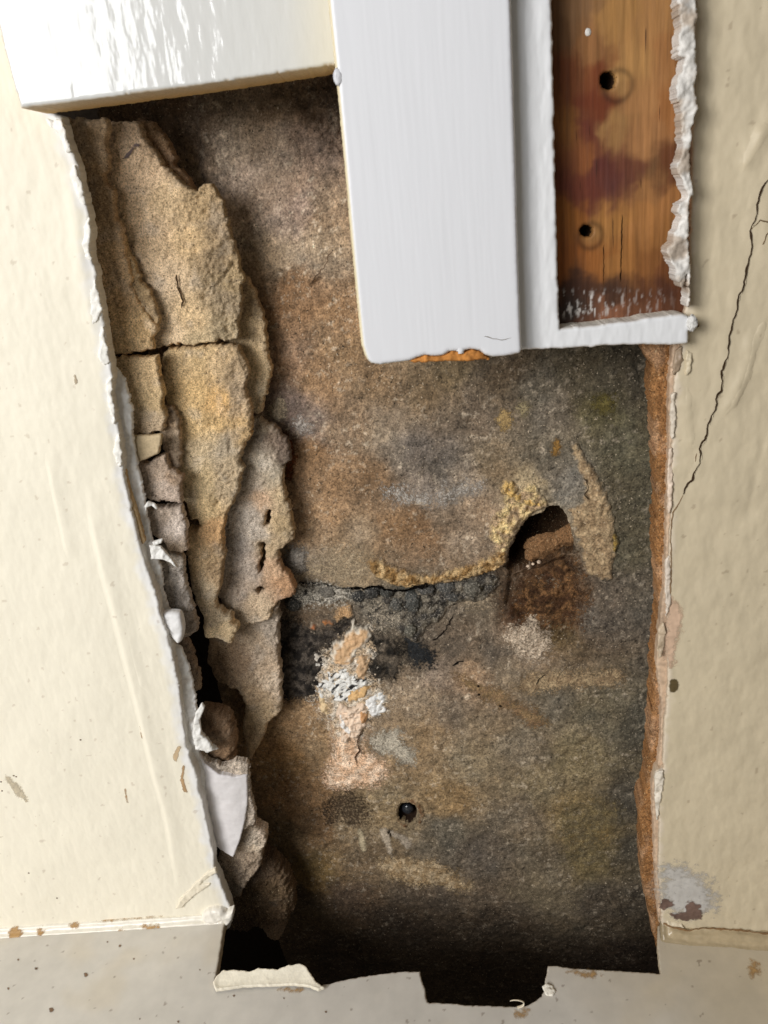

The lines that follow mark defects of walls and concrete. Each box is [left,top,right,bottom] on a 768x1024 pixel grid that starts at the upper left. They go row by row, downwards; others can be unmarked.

flaking render [70,165,93,261]
flaking render [90,280,111,365]
crack [669,180,768,594]
peeling [149,538,178,568]
damp [280,478,548,704]
spalling [508,505,574,574]
damp [453,613,627,732]
flaking render [192,702,257,857]
damp [317,788,374,827]
damp [365,725,419,768]
damp [375,853,476,896]
peeling [213,964,324,992]